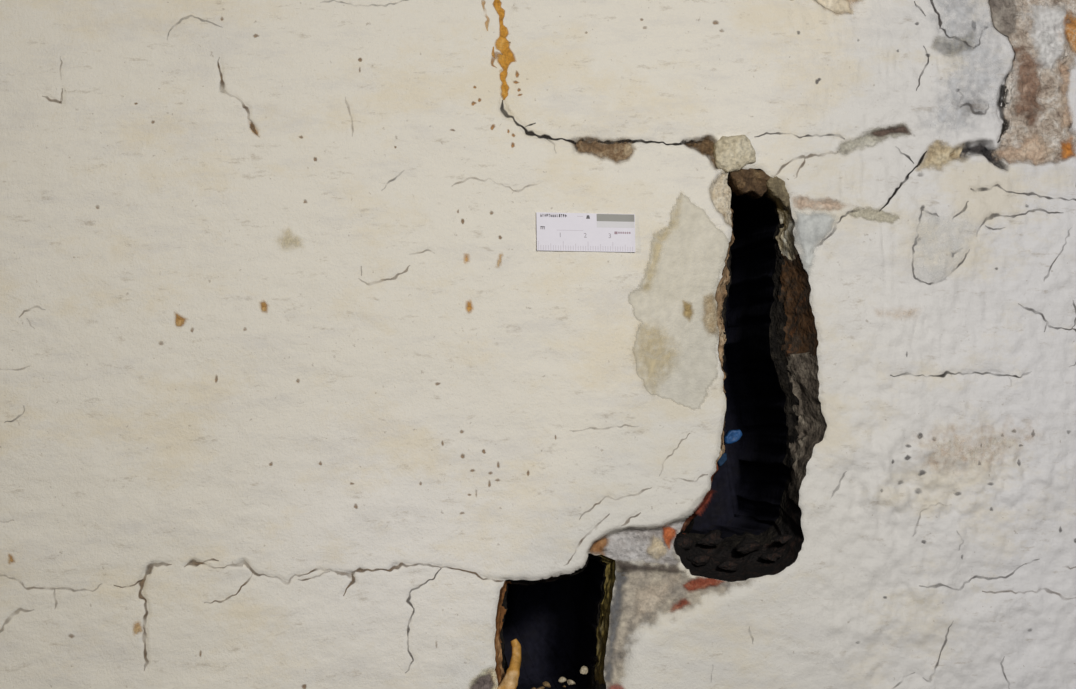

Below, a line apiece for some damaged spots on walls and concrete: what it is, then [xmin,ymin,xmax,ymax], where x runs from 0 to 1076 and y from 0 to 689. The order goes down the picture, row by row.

rust [482,0,522,100]
crack [501,100,703,145]
crack [755,132,831,168]
crack [914,0,1015,143]
spalling [918,0,1076,170]
crack [912,184,1076,285]
spalling [471,135,899,689]
crack [114,559,219,661]
crack [211,568,263,603]
crack [342,563,502,663]